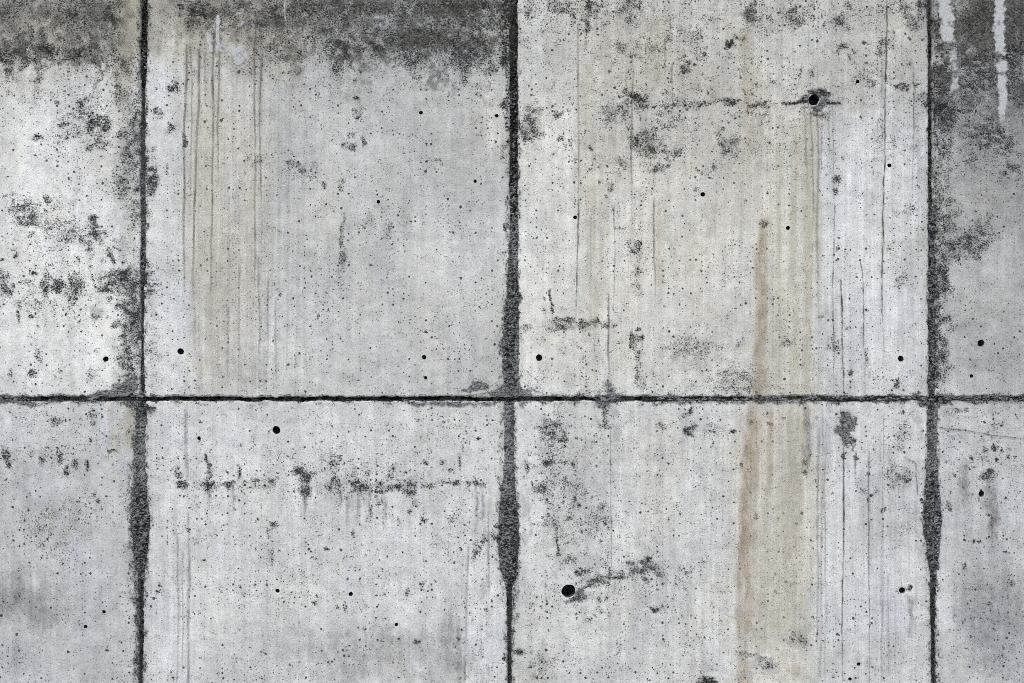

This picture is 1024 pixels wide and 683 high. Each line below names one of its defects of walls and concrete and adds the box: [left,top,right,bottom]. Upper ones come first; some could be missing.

damp [0,0,238,683]
damp [165,0,604,386]
damp [247,0,1024,683]